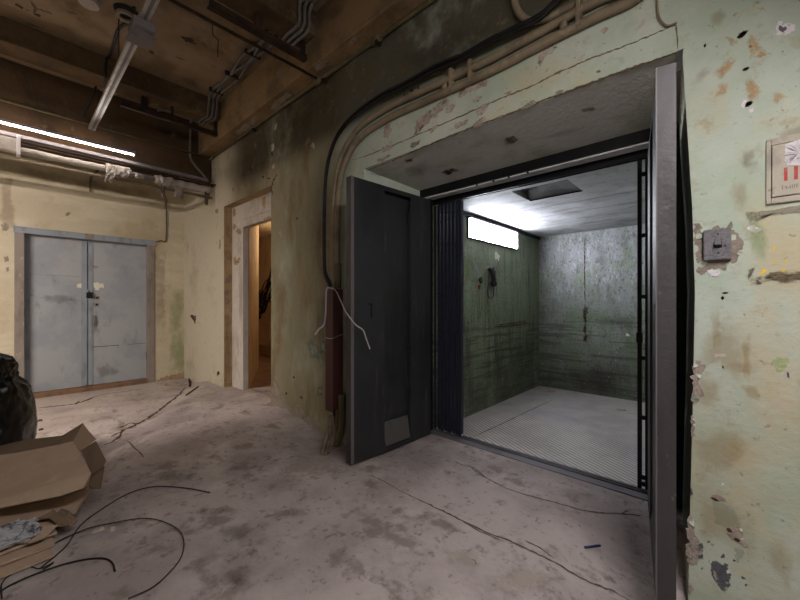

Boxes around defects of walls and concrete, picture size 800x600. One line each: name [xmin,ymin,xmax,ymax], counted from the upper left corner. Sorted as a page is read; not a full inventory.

spalling [367,53,676,171]
peeling [693,221,744,277]
spalling [690,359,705,404]
crack [104,388,185,458]
crack [448,458,639,516]
crack [373,476,629,600]
spalling [685,516,736,591]
peeling [726,524,748,548]